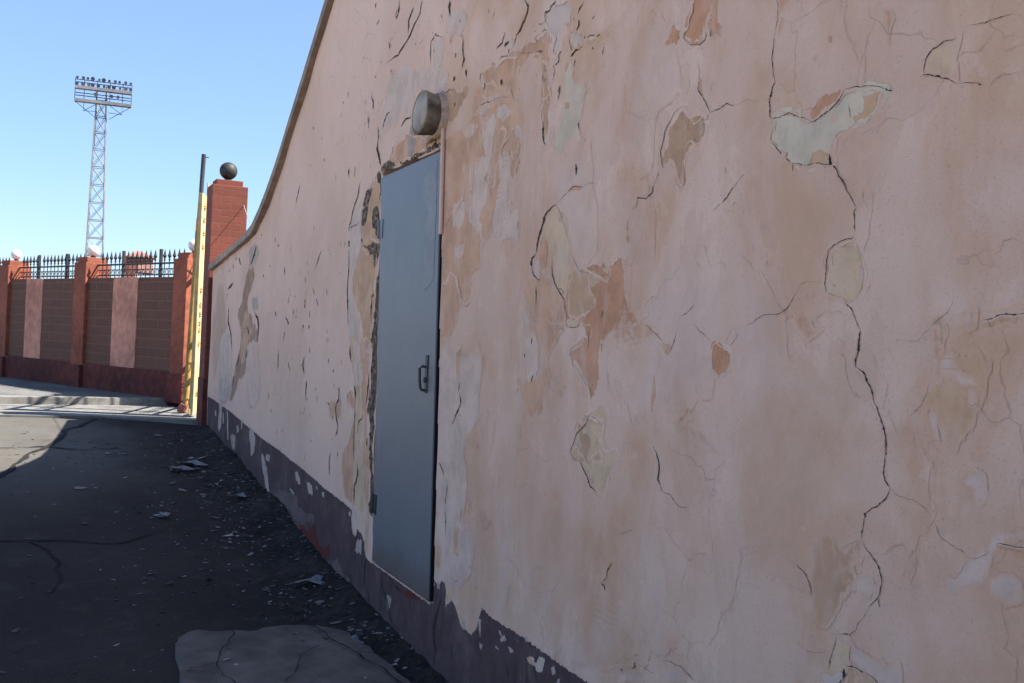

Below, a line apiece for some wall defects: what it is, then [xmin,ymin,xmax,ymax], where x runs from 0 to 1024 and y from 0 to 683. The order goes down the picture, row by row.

crack [387,2,422,63]
peeling [661,0,726,50]
peeling [658,100,709,192]
peeling [768,81,901,175]
crack [829,156,856,236]
peeling [261,0,613,604]
peeling [520,205,676,503]
peeling [693,324,738,383]
crack [0,419,120,477]
peeling [215,410,242,450]
crack [836,302,914,635]
peeling [527,656,560,683]